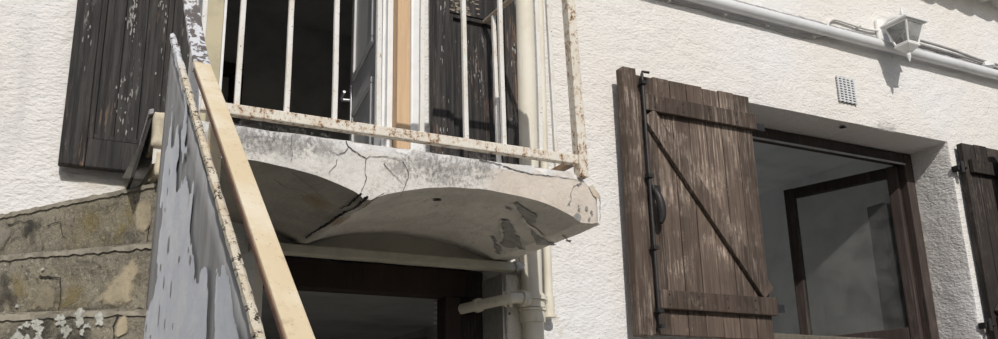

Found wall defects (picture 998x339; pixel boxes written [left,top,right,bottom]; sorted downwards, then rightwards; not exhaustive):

peeling [134,1,239,339]
crack [244,135,409,238]
crack [479,159,601,225]
crack [6,220,67,243]
peeling [491,202,572,254]